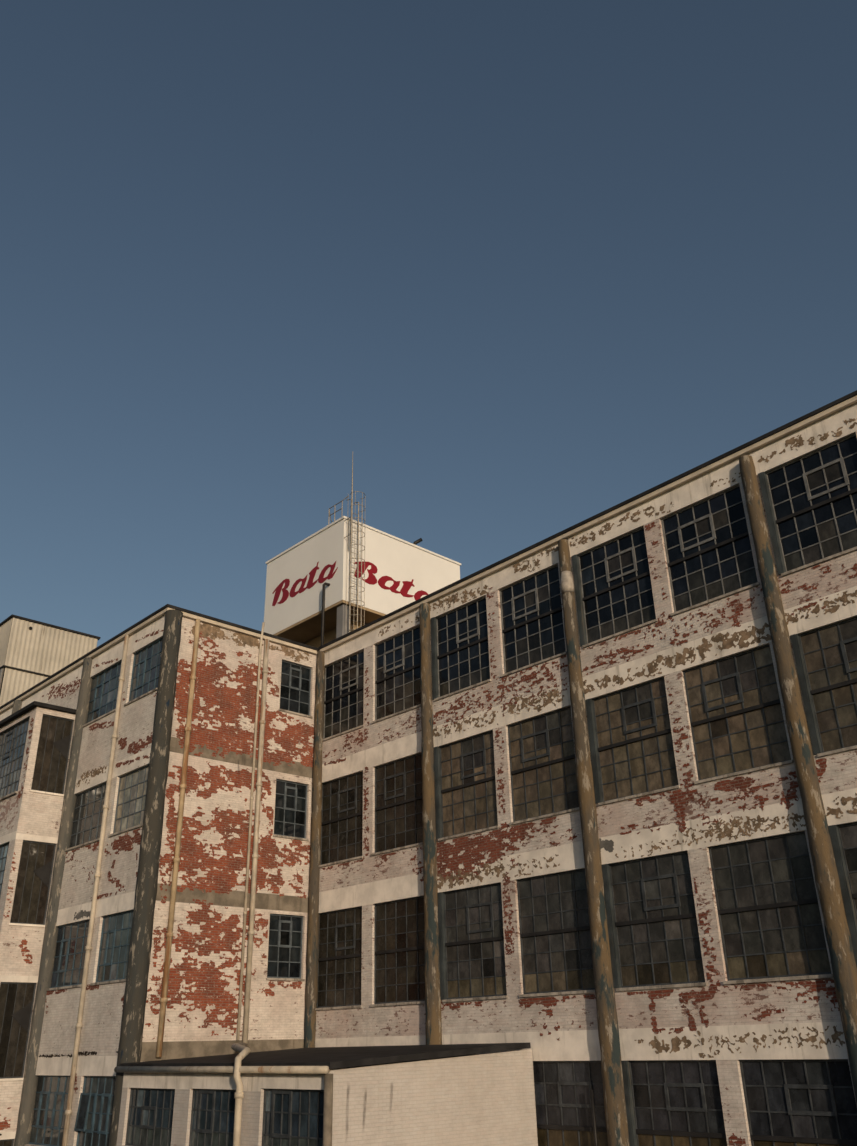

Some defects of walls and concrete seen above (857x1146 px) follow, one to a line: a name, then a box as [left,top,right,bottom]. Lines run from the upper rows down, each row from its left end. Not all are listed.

peeling [758,418,857,463]
peeling [513,501,771,694]
peeling [145,585,577,1039]
peeling [599,717,806,858]
peeling [816,758,827,783]
peeling [826,793,857,818]
peeling [627,877,845,1058]
peeling [519,994,596,1040]
peeling [729,1133,746,1146]